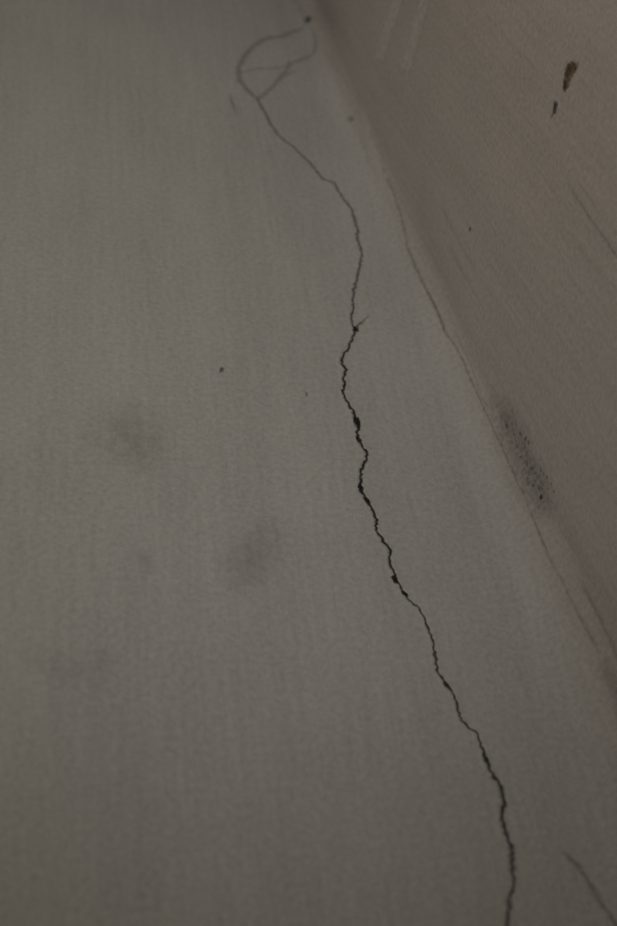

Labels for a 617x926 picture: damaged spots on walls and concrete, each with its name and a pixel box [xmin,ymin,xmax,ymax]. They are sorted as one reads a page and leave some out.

crack [336,192,514,922]